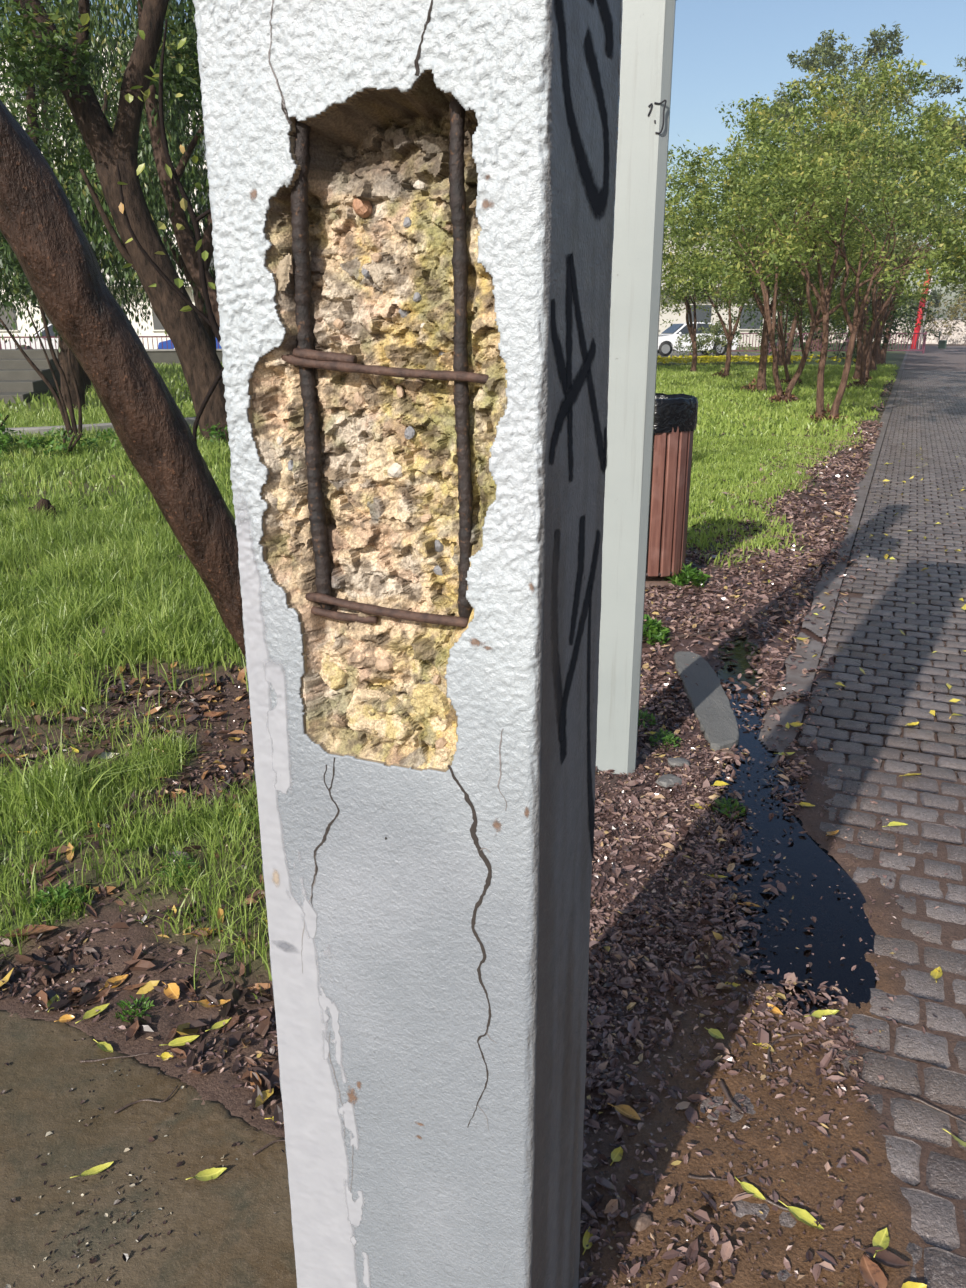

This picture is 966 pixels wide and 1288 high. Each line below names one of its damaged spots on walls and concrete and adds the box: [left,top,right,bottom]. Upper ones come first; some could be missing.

crack [268,0,292,125]
crack [414,0,433,76]
spalling [235,72,507,1288]
crack [301,758,340,974]
crack [448,728,507,1130]